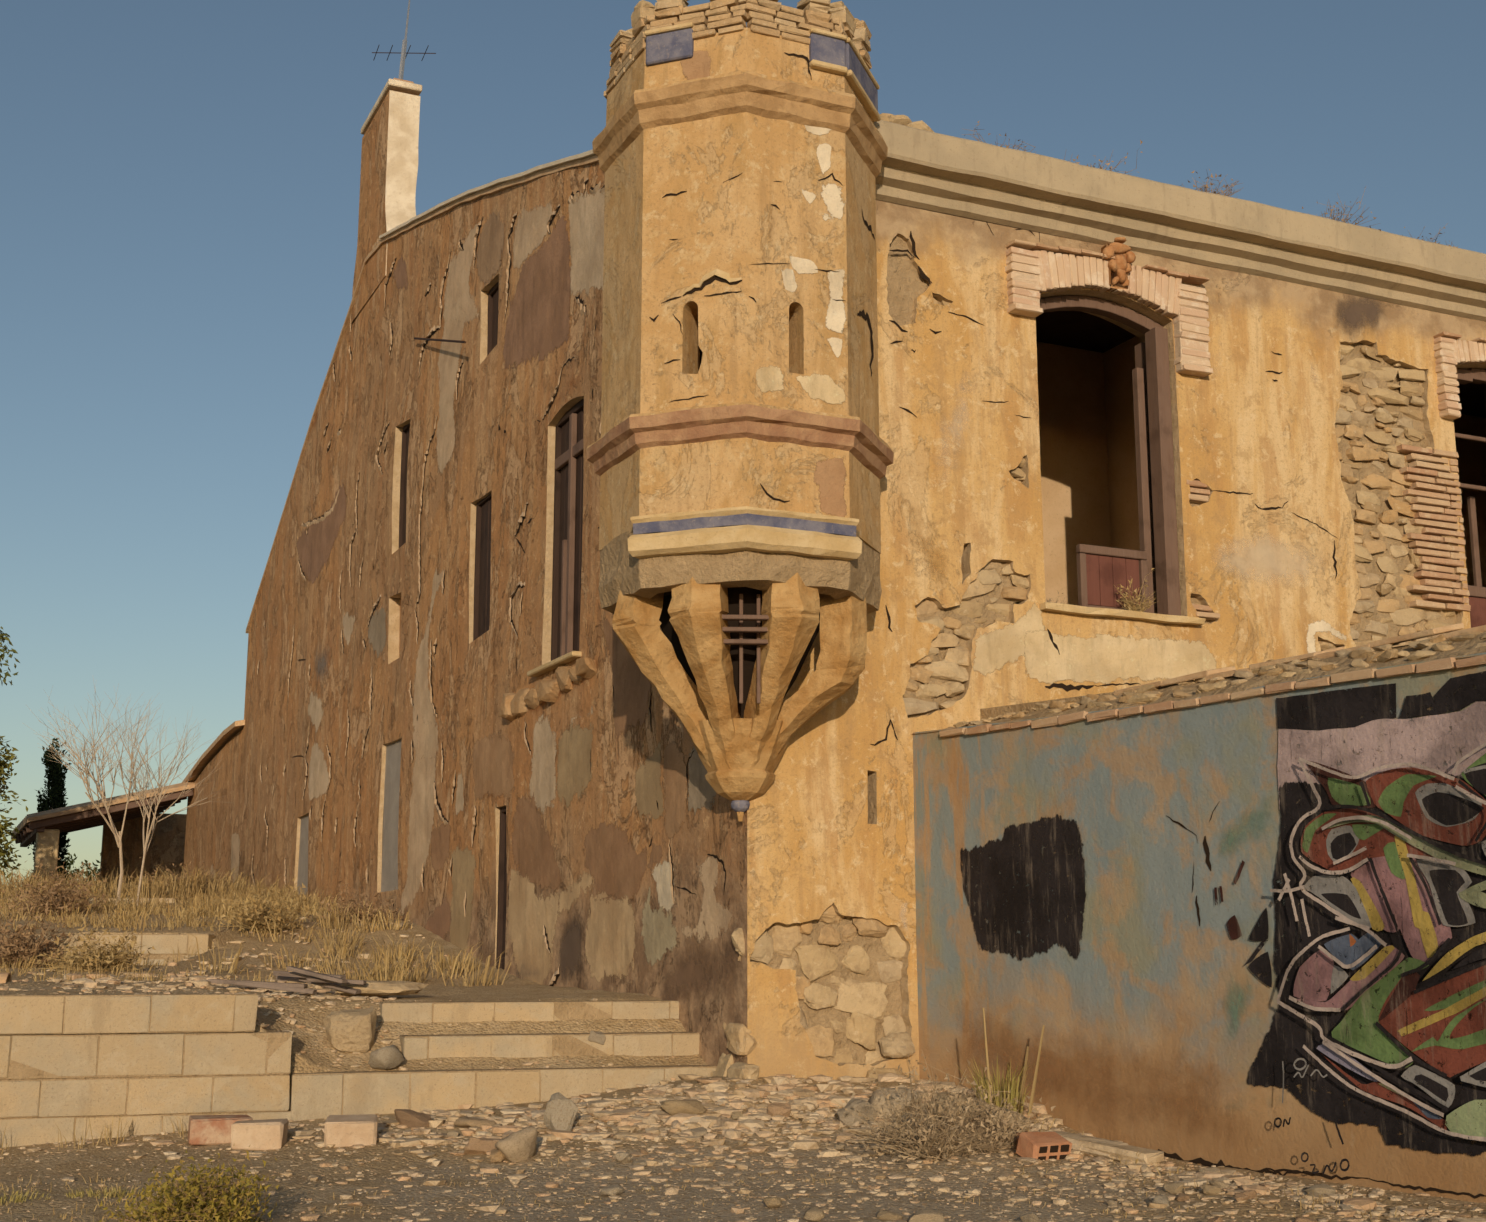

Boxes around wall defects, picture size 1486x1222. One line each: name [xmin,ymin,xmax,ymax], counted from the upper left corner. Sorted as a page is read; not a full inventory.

flaking render [801,125,845,221]
flaking render [436,225,479,474]
flaking render [781,256,846,357]
crack [649,211,983,377]
crack [1213,490,1337,578]
flaking render [1306,343,1467,653]
flaking render [398,569,443,917]
flaking render [602,619,651,739]
flaking render [903,561,1220,718]
crack [1167,801,1220,926]
flaking render [507,856,907,1065]
water stain [971,1035,1116,1107]